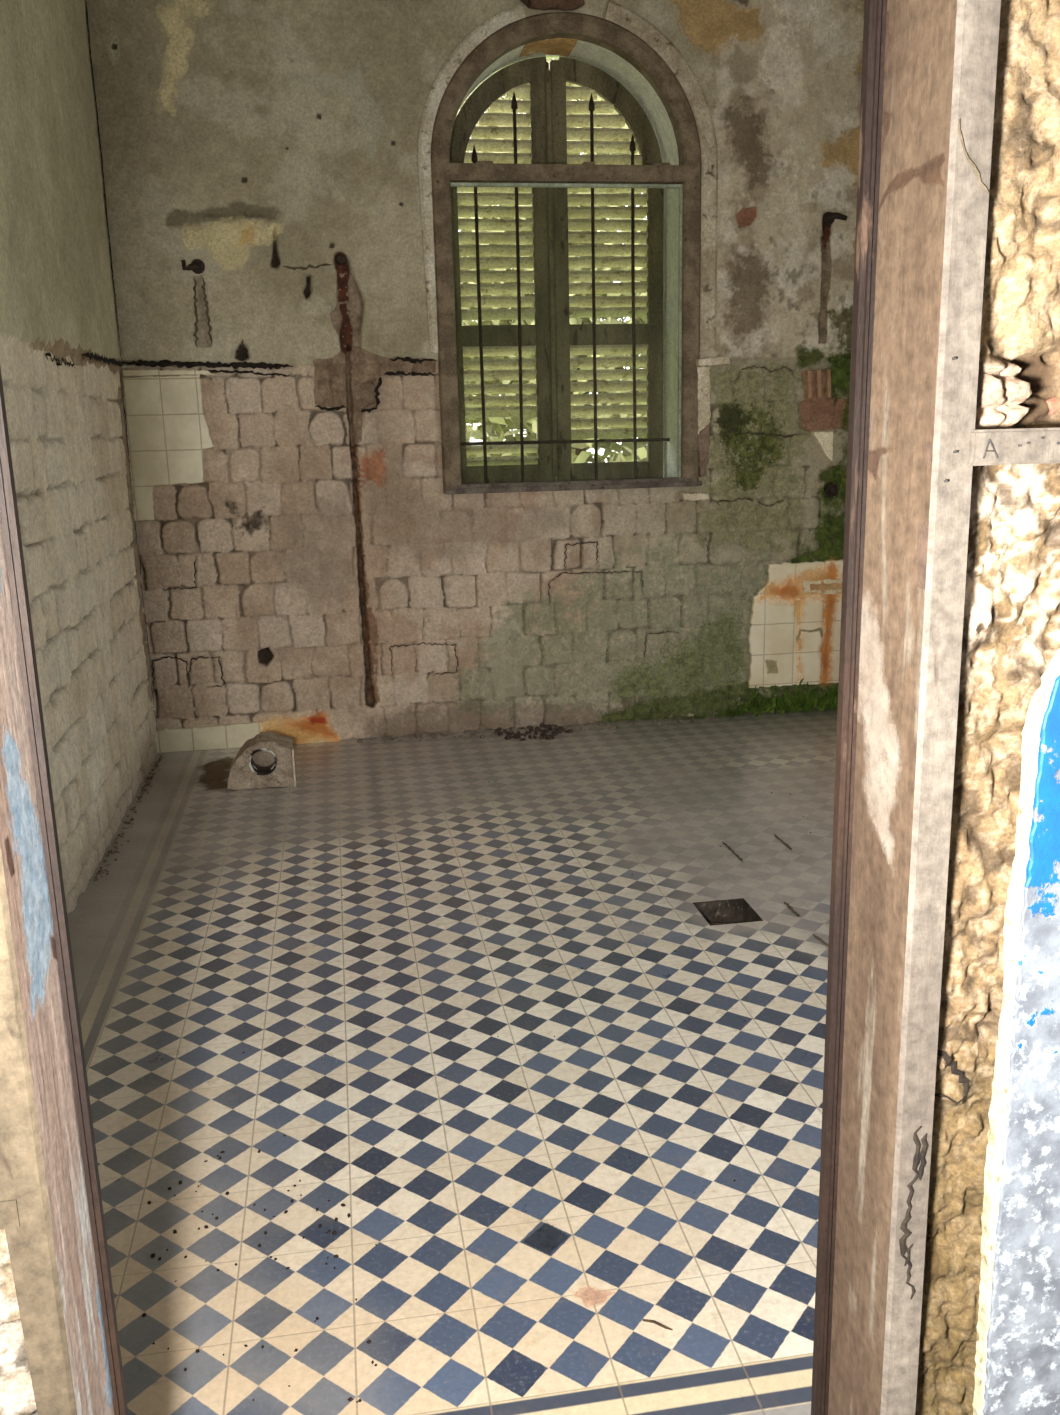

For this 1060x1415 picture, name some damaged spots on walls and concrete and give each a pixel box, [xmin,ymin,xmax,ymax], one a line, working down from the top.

spalling [521,0,585,11]
peeling [671,0,764,54]
peeling [822,127,860,185]
peeling [183,217,282,270]
rust [822,221,831,249]
rust [766,564,842,682]
rust [263,714,337,744]
peeling [972,649,1060,1415]
crack [899,1050,970,1299]